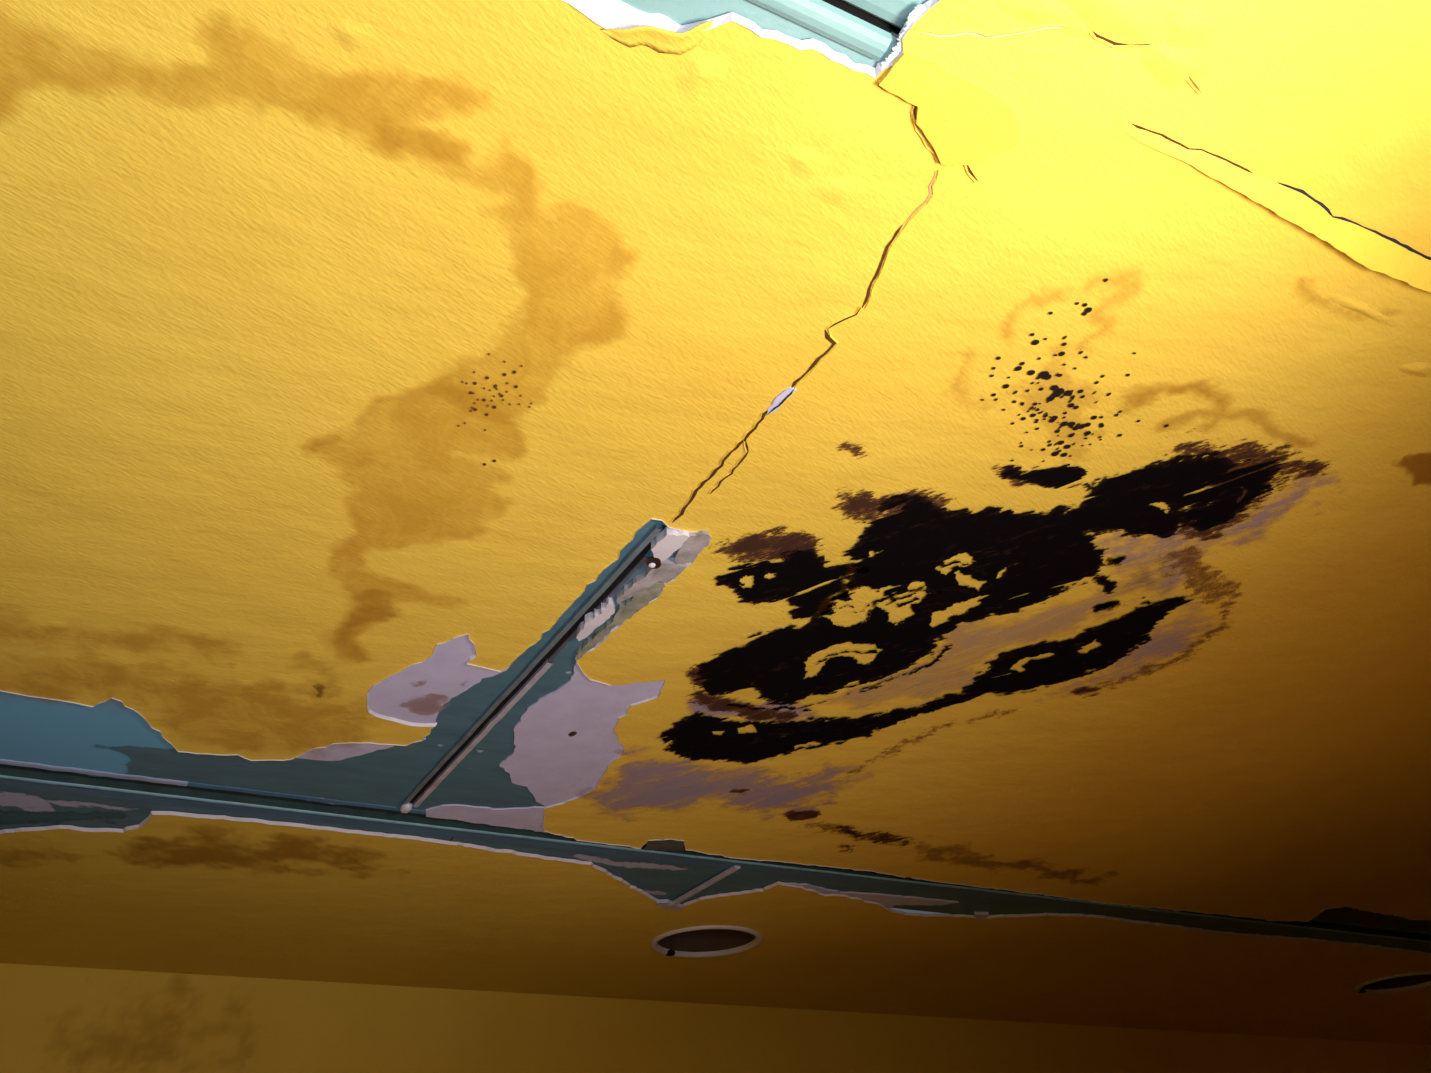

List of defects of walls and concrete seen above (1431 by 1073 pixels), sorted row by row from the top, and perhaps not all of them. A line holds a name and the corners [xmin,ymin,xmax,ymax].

peeling [562,0,940,79]
crack [915,23,1202,95]
crack [670,104,978,523]
leakage [457,353,532,431]
leakage [1400,454,1431,484]
mould [581,333,1331,853]
peeling [0,518,1431,955]